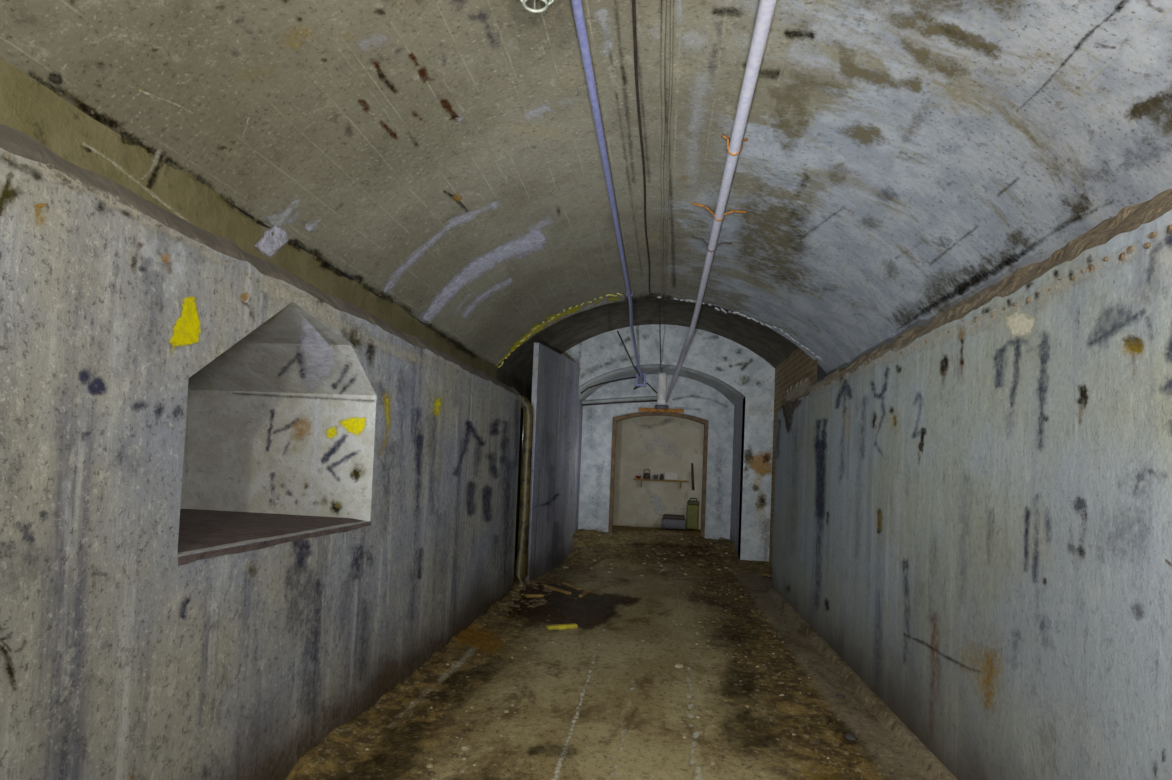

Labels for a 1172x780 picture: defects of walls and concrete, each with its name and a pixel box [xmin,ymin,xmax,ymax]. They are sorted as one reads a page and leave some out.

corrosion [370,62,396,92]
corrosion [409,53,430,83]
corrosion [441,99,460,120]